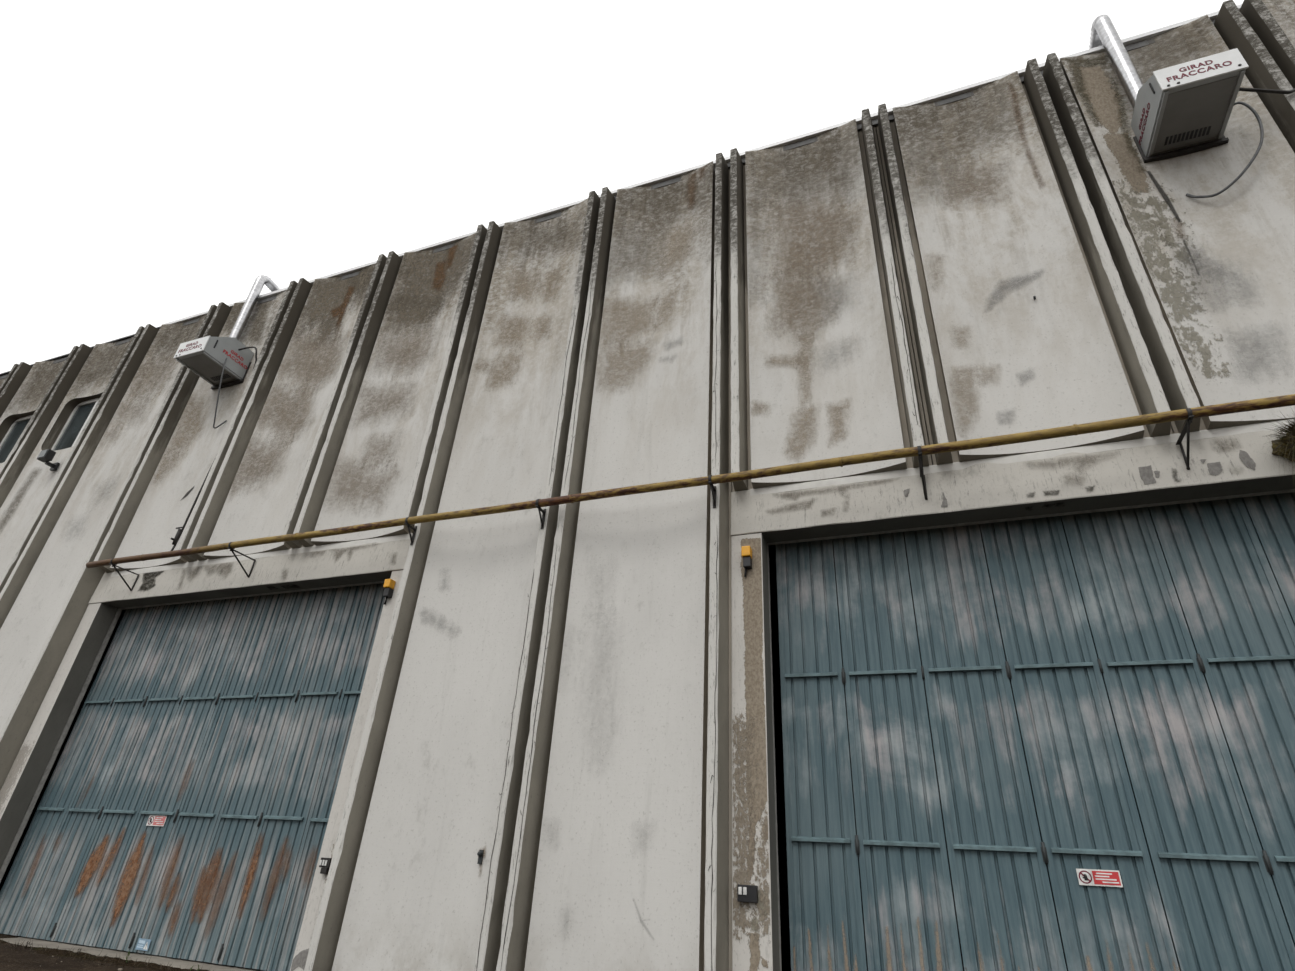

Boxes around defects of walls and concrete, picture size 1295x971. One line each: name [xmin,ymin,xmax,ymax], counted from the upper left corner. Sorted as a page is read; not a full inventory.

peeling [1077,66,1231,382]
leakage [284,267,375,380]
leakage [385,237,475,365]
leakage [771,203,853,452]
peeling [732,538,771,971]
corrosion [75,828,150,924]
corrosion [160,839,286,933]
peeling [793,921,858,971]
peeling [886,918,942,971]